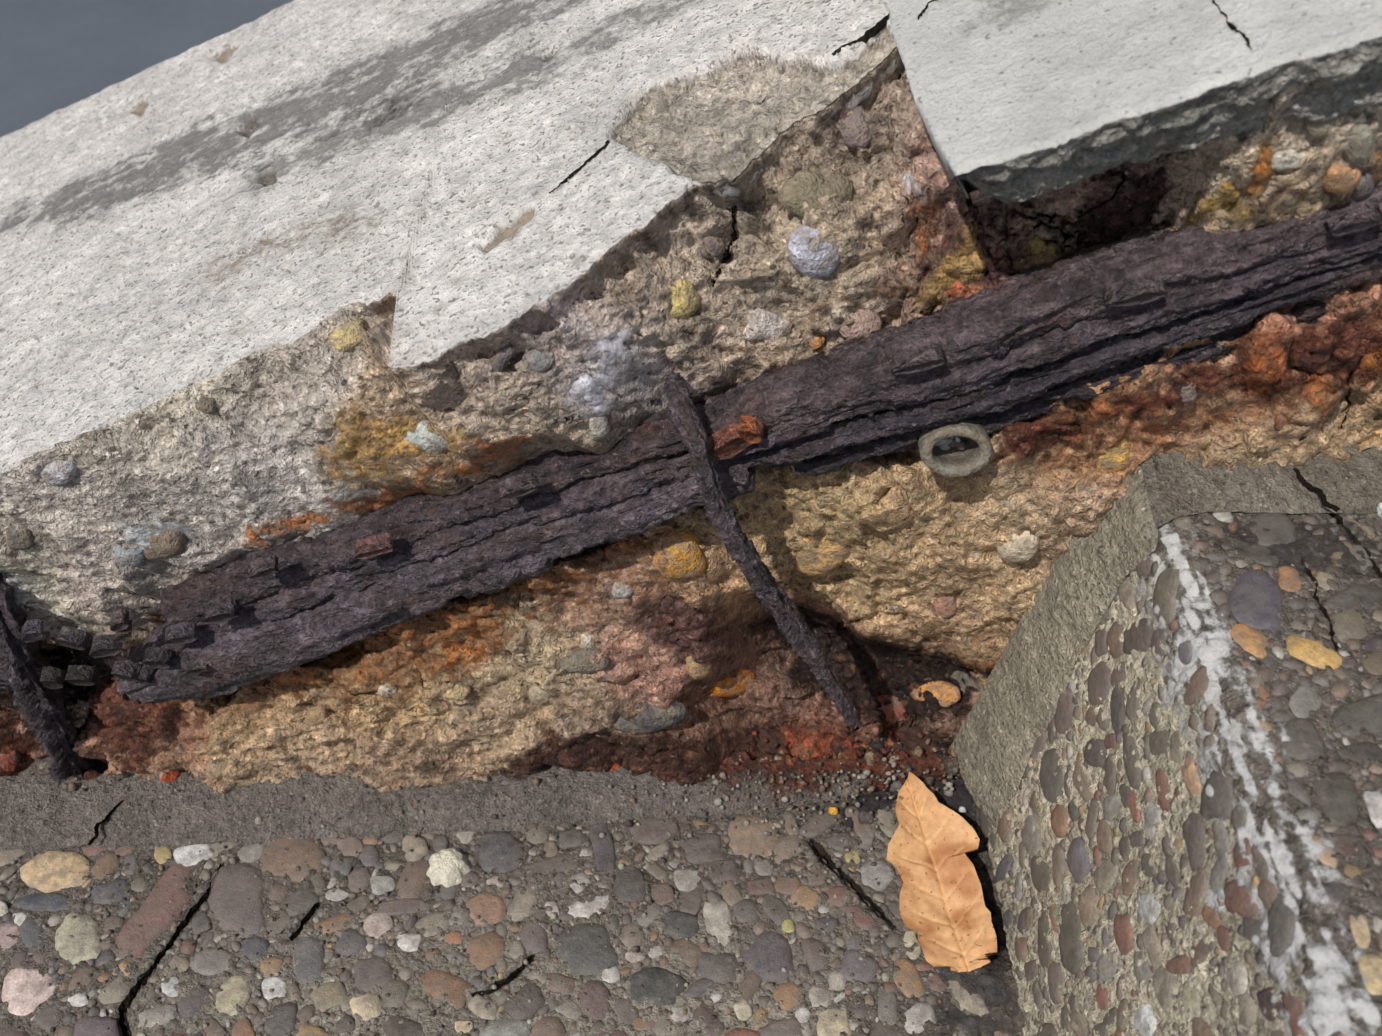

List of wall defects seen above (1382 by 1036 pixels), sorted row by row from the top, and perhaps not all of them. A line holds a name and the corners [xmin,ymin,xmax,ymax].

crack [832,0,938,56]
crack [1212,0,1252,51]
crack [549,140,610,194]
spalling [0,26,1382,667]
rust [693,144,1382,500]
rust [21,402,738,774]
spalling [62,278,1382,795]
rust [0,670,44,776]
spalling [0,689,49,776]
rust [489,596,996,796]
damp [1135,522,1382,1036]
crack [118,863,222,1036]